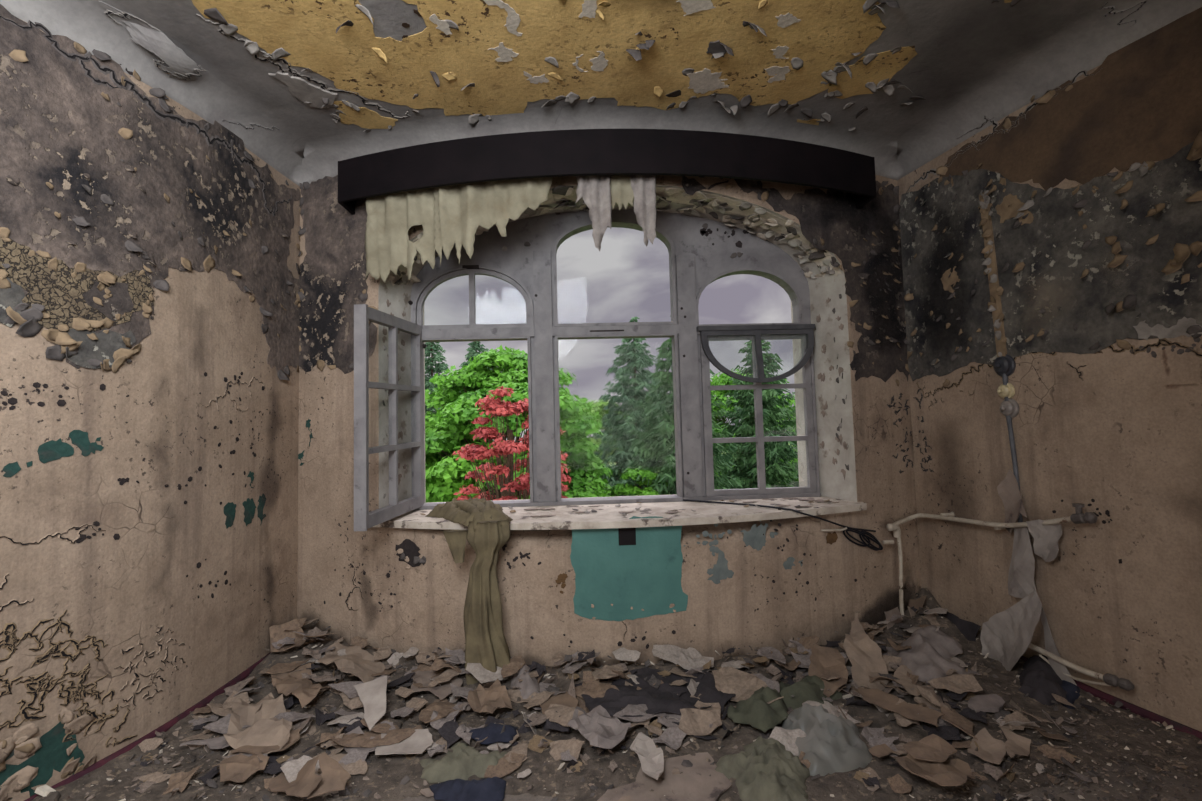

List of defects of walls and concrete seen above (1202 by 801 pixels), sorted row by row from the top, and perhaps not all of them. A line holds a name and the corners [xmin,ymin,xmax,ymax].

peeling [192,0,925,132]
peeling [0,4,443,391]
peeling [519,185,589,219]
peeling [656,7,1202,480]
peeling [1,382,69,410]
peeling [214,420,266,529]
crack [0,523,106,546]
crack [0,573,185,747]
peeling [0,708,97,801]